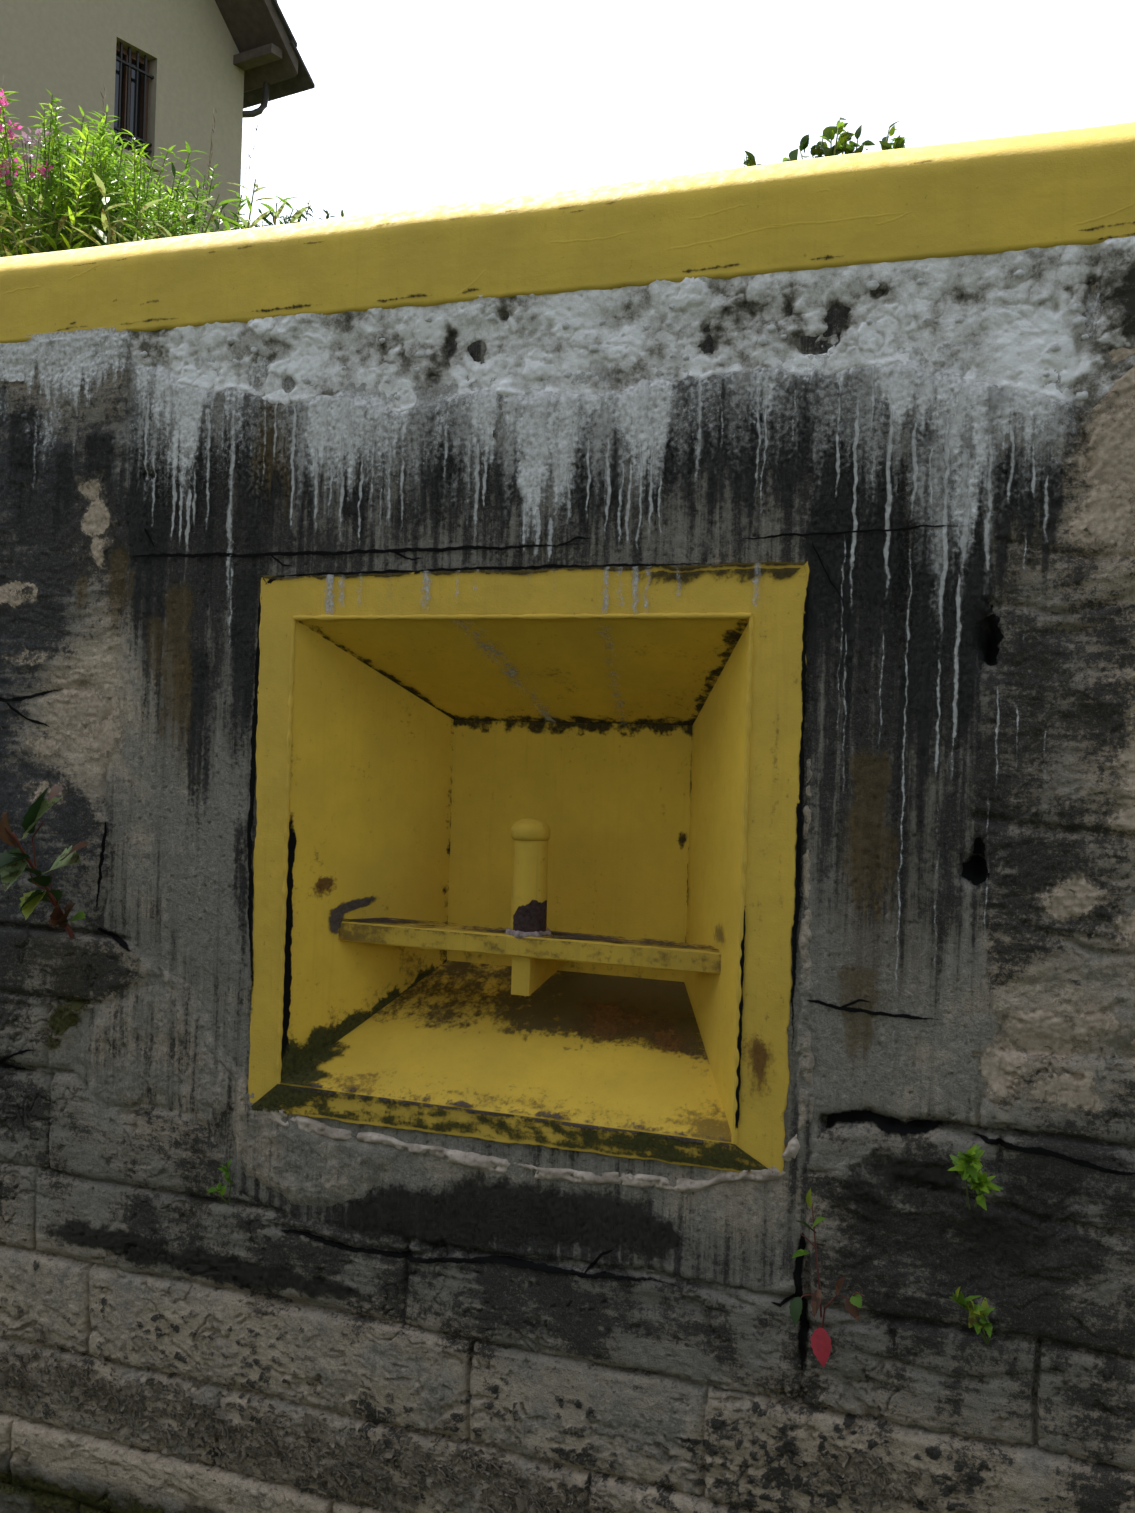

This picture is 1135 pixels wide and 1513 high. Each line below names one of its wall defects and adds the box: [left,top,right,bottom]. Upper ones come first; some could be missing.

leakage [0,318,1072,960]
crack [0,688,64,727]
crack [743,525,968,1045]
rust [513,900,547,932]
rust [744,1039,770,1091]